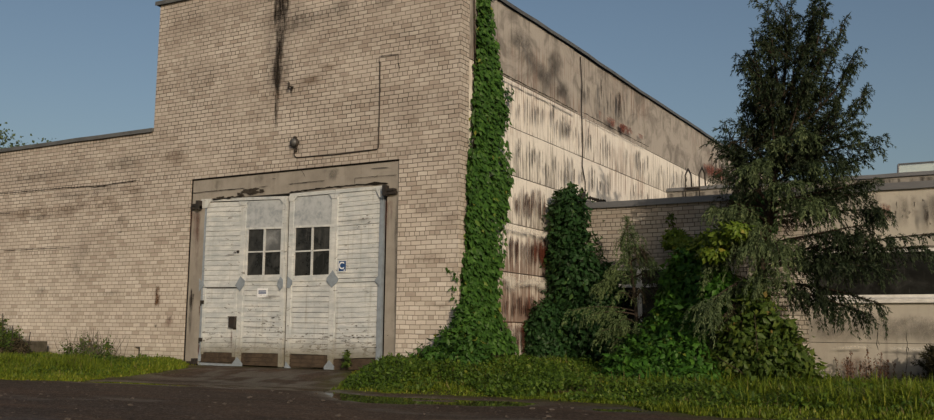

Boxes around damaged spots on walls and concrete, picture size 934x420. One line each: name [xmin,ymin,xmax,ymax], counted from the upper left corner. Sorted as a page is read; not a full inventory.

leakage [273,0,289,90]
leakage [508,85,608,151]
leakage [518,139,610,191]
spalling [216,188,265,199]
leakage [515,187,545,218]